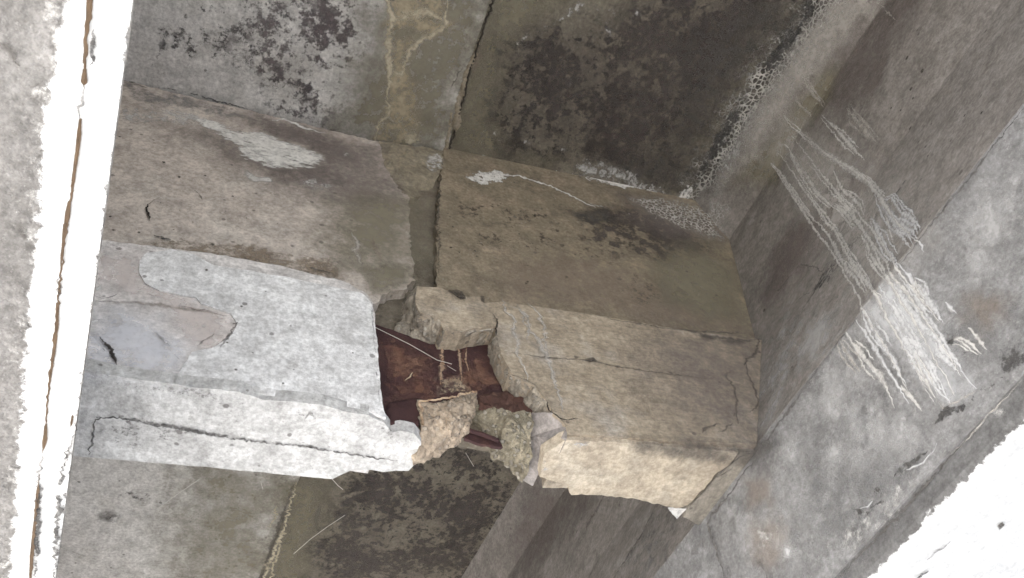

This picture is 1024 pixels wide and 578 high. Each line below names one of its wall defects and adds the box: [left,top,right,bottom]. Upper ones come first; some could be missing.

damp [123,0,452,201]
crack [29,0,397,578]
peeling [153,229,338,277]
rust [393,347,497,425]
spalling [394,286,584,486]
crack [603,316,760,431]
damp [459,0,1024,425]
damp [263,448,516,578]